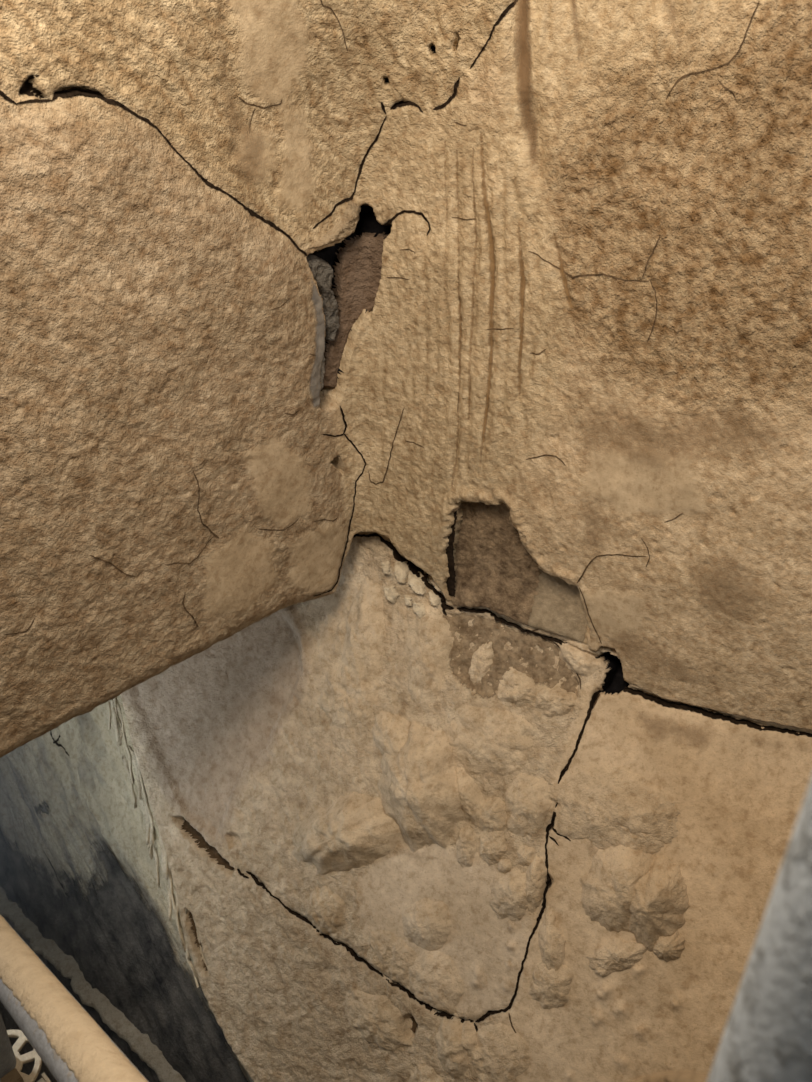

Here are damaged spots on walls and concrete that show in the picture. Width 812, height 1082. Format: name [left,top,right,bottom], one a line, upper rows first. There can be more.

crack [0,0,567,649]
spalling [381,501,588,698]
crack [237,538,812,1033]